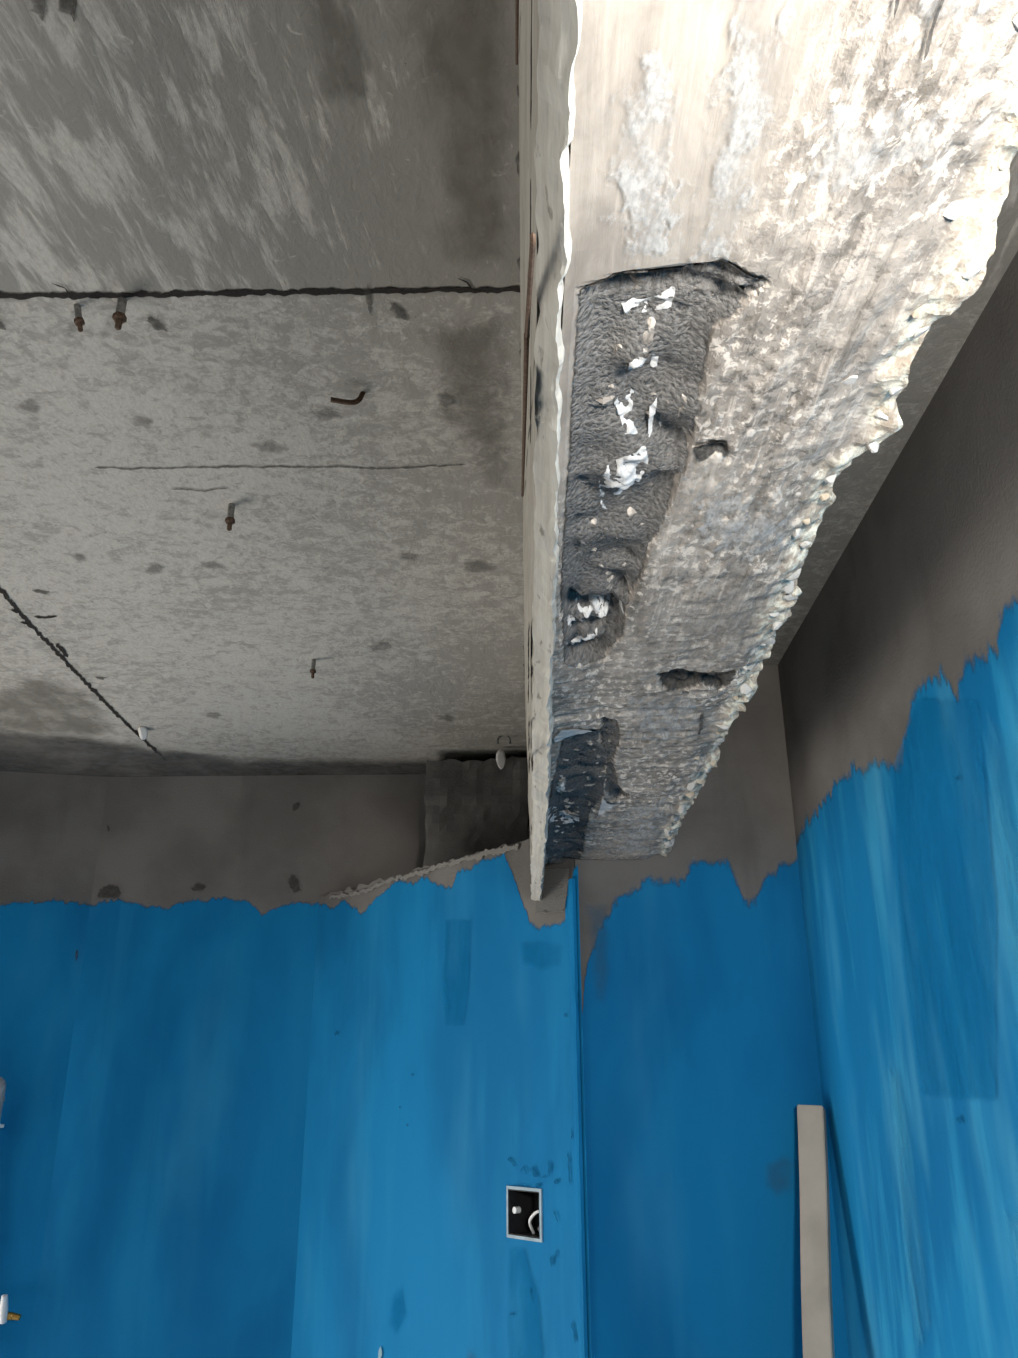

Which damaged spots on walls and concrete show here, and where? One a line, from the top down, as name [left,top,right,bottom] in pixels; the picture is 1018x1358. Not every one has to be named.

spalling [943,201,969,220]
spalling [962,256,985,280]
spalling [911,304,931,339]
spalling [561,259,766,667]
spalling [820,474,836,501]
spalling [792,519,812,548]
spalling [659,568,801,712]
spalling [656,713,729,848]
spalling [536,717,629,914]